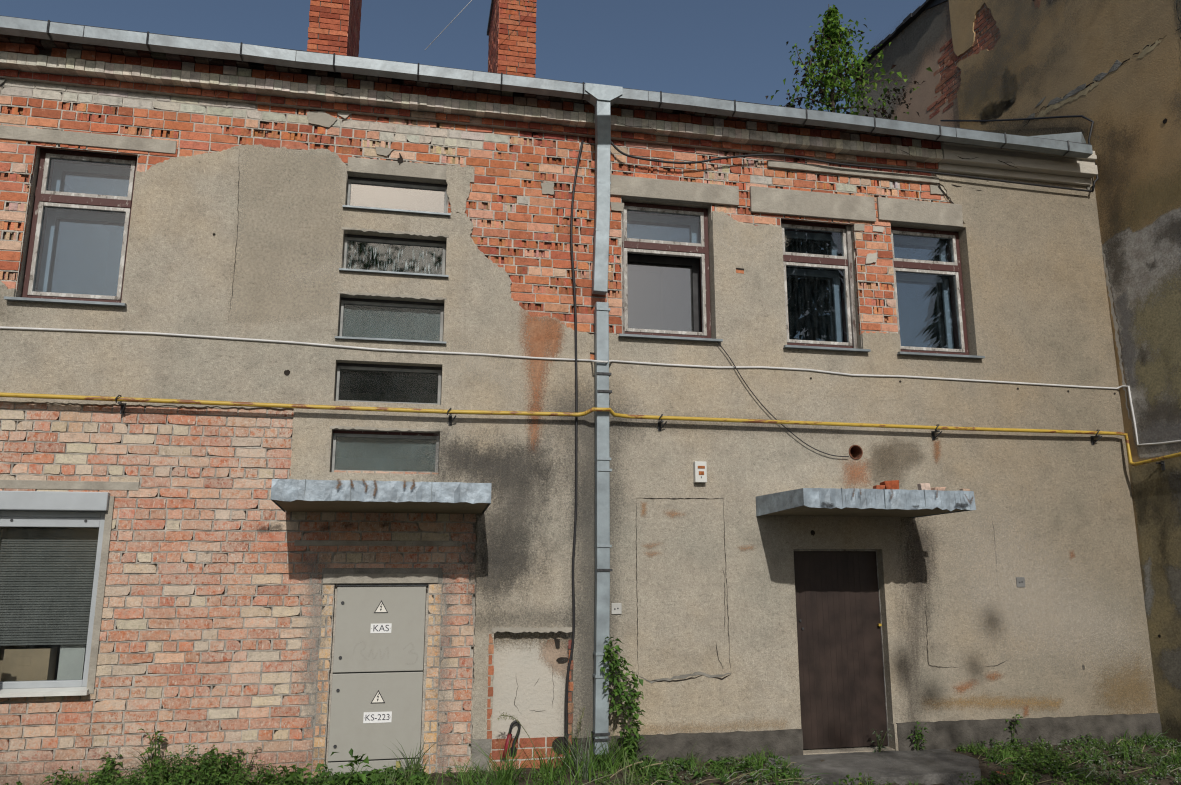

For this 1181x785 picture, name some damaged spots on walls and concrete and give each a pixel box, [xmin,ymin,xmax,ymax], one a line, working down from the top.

peeling [927,4,1001,119]
crack [1019,3,1181,131]
peeling [0,78,624,334]
peeling [610,140,949,346]
corrosion [521,313,562,451]
damp [438,390,595,738]
crack [636,498,731,683]
damp [903,520,934,653]
spalling [471,626,574,771]